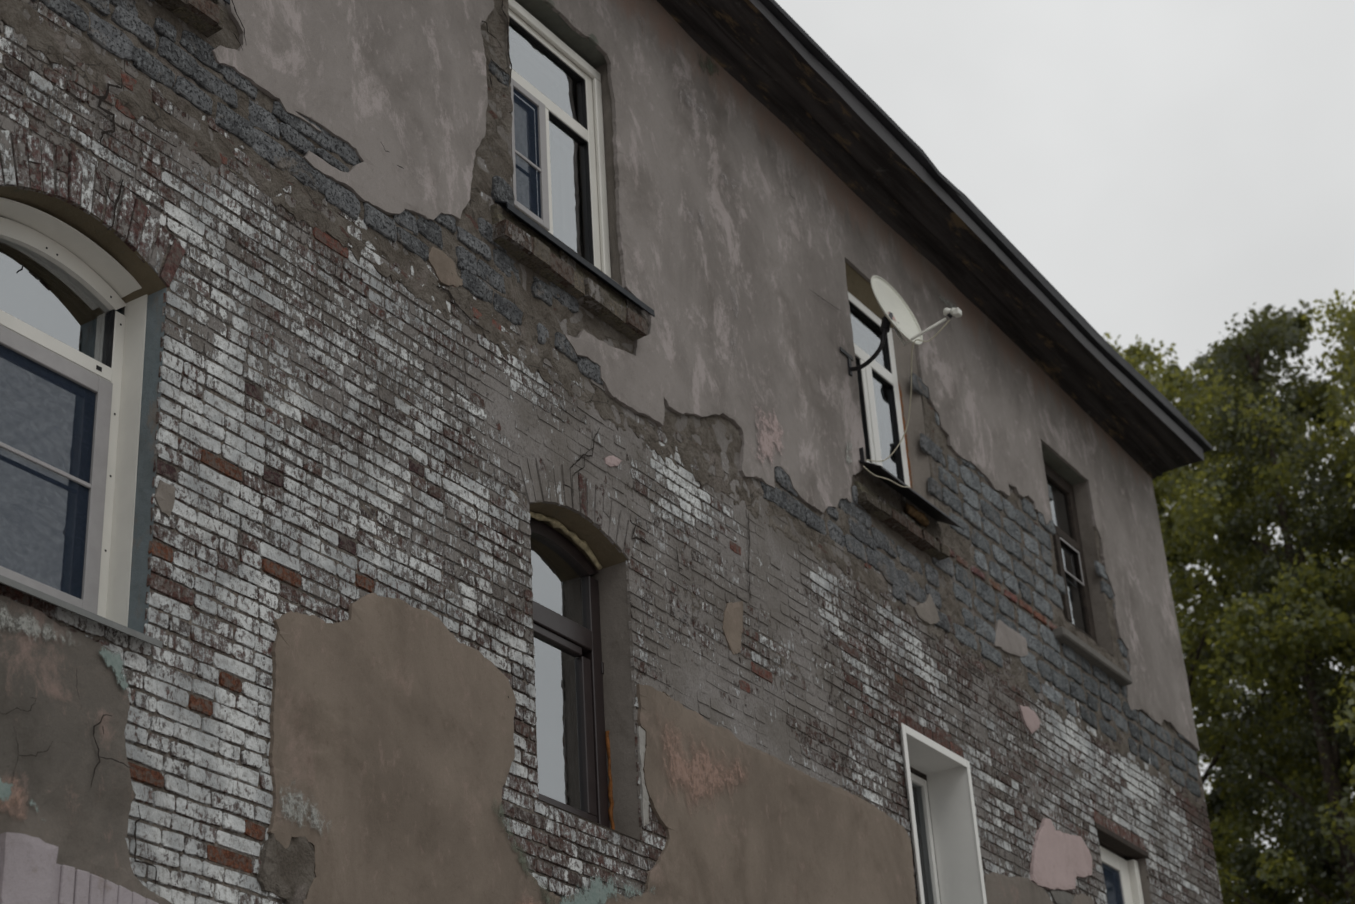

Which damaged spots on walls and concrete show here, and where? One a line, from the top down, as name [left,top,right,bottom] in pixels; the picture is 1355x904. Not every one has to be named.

spalling [0,0,1206,810]
crack [76,672,130,786]
peeling [1029,818,1092,904]